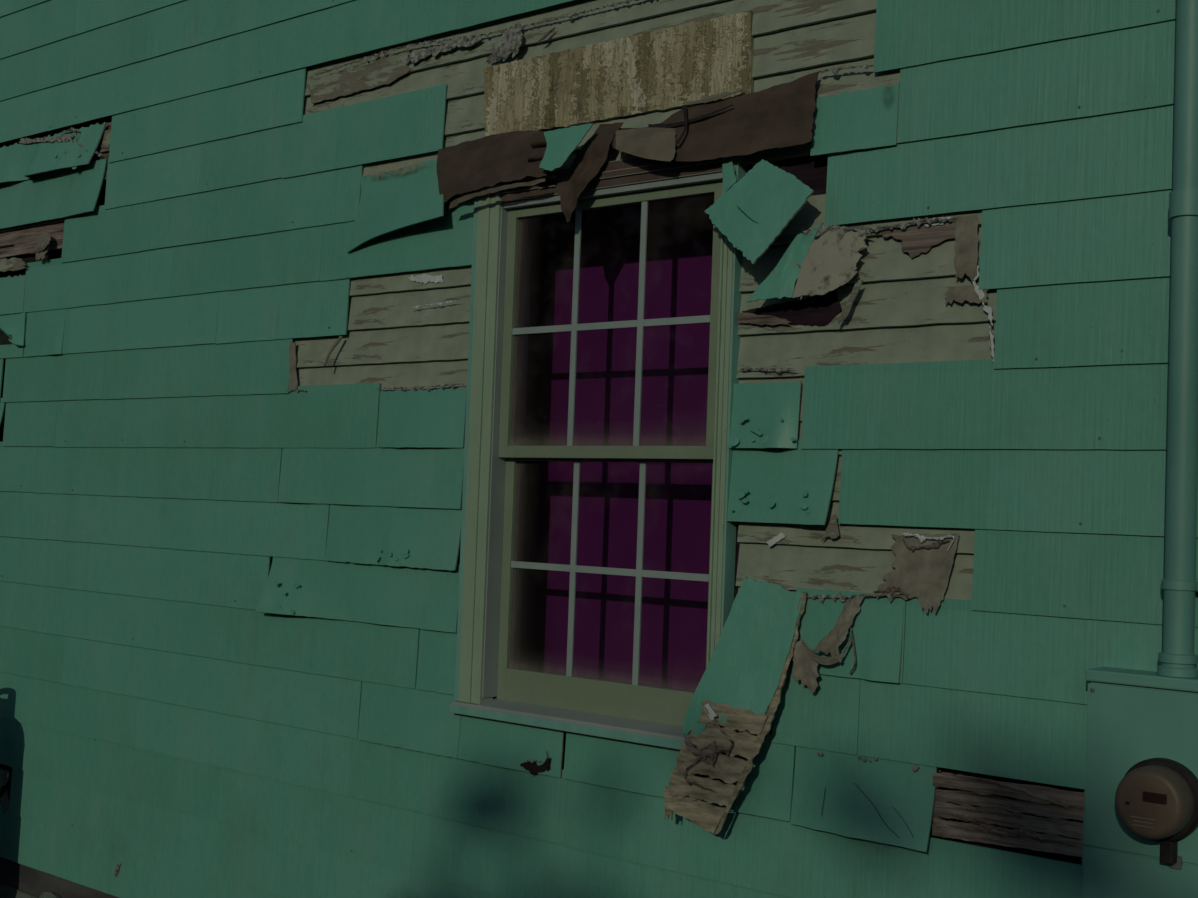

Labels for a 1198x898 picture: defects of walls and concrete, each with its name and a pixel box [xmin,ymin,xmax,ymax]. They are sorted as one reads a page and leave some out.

peeling [303,0,900,176]
peeling [722,114,814,194]
peeling [0,217,65,272]
peeling [287,265,472,392]
peeling [736,194,997,441]
peeling [736,449,975,614]